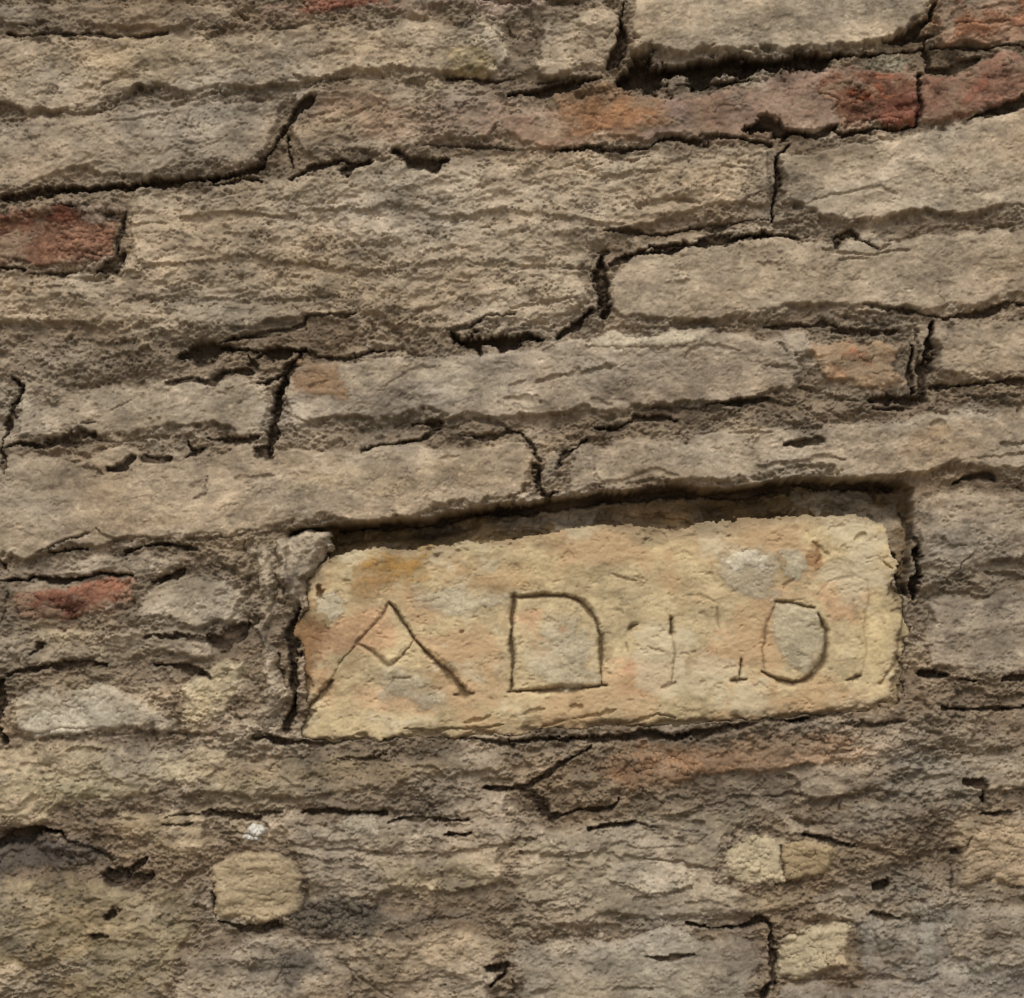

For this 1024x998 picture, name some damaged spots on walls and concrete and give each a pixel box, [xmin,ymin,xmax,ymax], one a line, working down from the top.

crack [107,313,402,472]
crack [341,407,921,600]
crack [436,713,905,831]